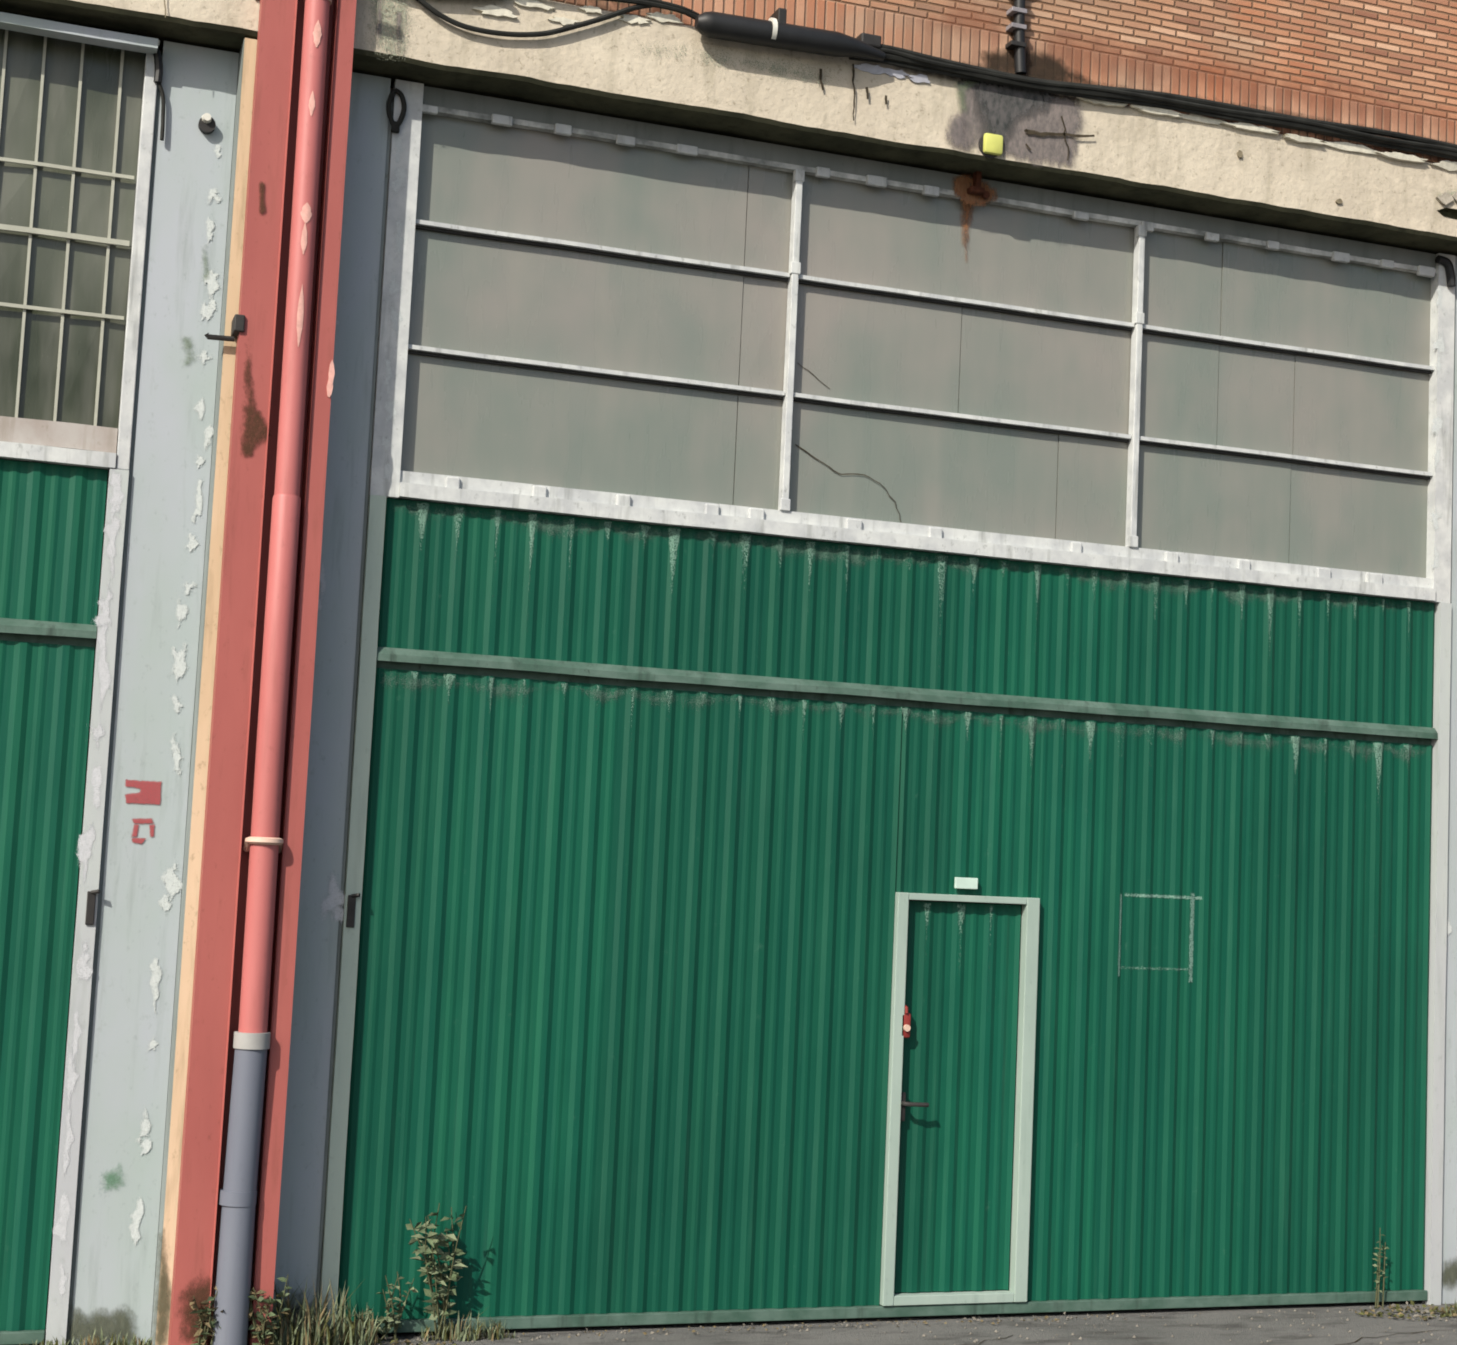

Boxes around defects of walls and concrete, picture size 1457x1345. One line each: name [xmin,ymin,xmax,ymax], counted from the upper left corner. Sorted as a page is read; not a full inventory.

damp [946,80,1082,166]
peeling [1076,97,1457,219]
corrosion [954,175,997,241]
peeling [185,397,214,552]
crack [795,444,902,523]
damp [417,502,429,550]
damp [639,524,681,606]
peeling [170,581,197,713]
damp [1086,721,1096,771]
damp [1374,742,1384,799]
peeling [158,857,182,914]
peeling [128,1197,144,1246]